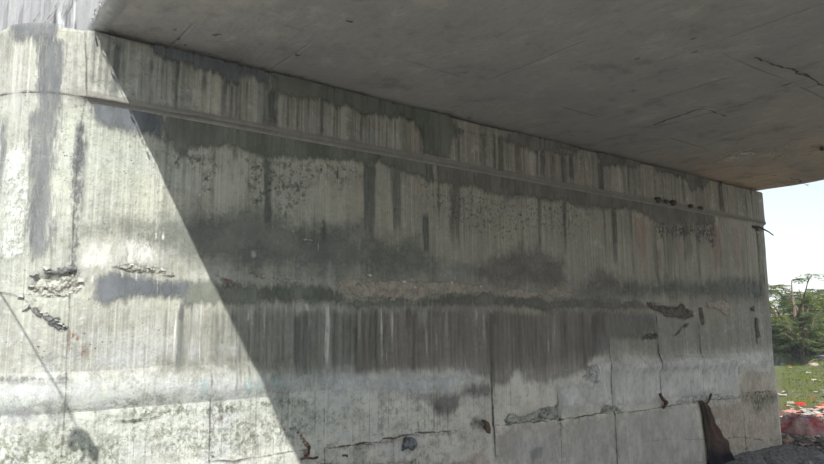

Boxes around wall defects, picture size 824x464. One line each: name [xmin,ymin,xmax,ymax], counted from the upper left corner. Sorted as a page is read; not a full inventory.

crack [754,57,824,86]
water stain [94,44,716,285]
spalling [16,264,84,330]
water stain [69,126,766,414]
spalling [647,302,704,336]
crack [656,316,764,407]
rust [297,431,319,460]
spalling [504,405,562,425]
crack [491,343,646,464]